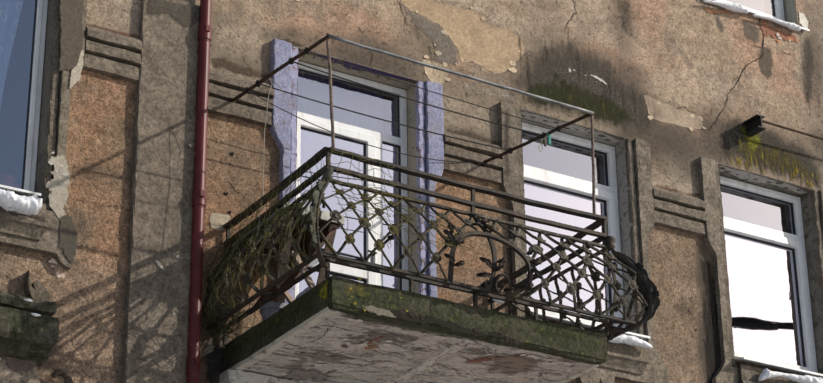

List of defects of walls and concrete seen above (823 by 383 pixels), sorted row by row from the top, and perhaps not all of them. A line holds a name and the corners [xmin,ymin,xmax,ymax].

flaking render [70,50,84,88]
flaking render [398,0,525,85]
damp [520,41,652,130]
flaking render [644,95,706,131]
crack [709,19,787,130]
flaking render [46,152,71,220]
damp [721,119,819,187]